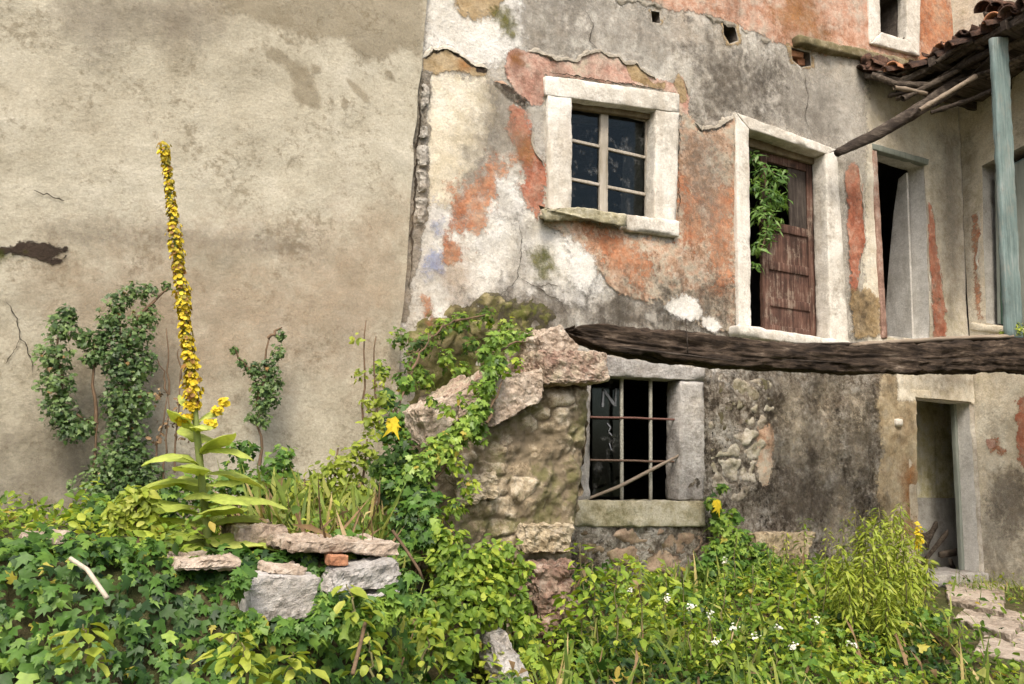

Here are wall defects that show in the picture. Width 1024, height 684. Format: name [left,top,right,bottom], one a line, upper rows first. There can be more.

crack [5,299,33,375]
flaking render [423,44,736,334]
flaking render [845,162,867,292]
flaking render [928,202,948,337]
flaking render [971,212,983,319]
spalling [570,366,897,593]
damp [767,376,872,553]
spalling [986,397,1024,537]